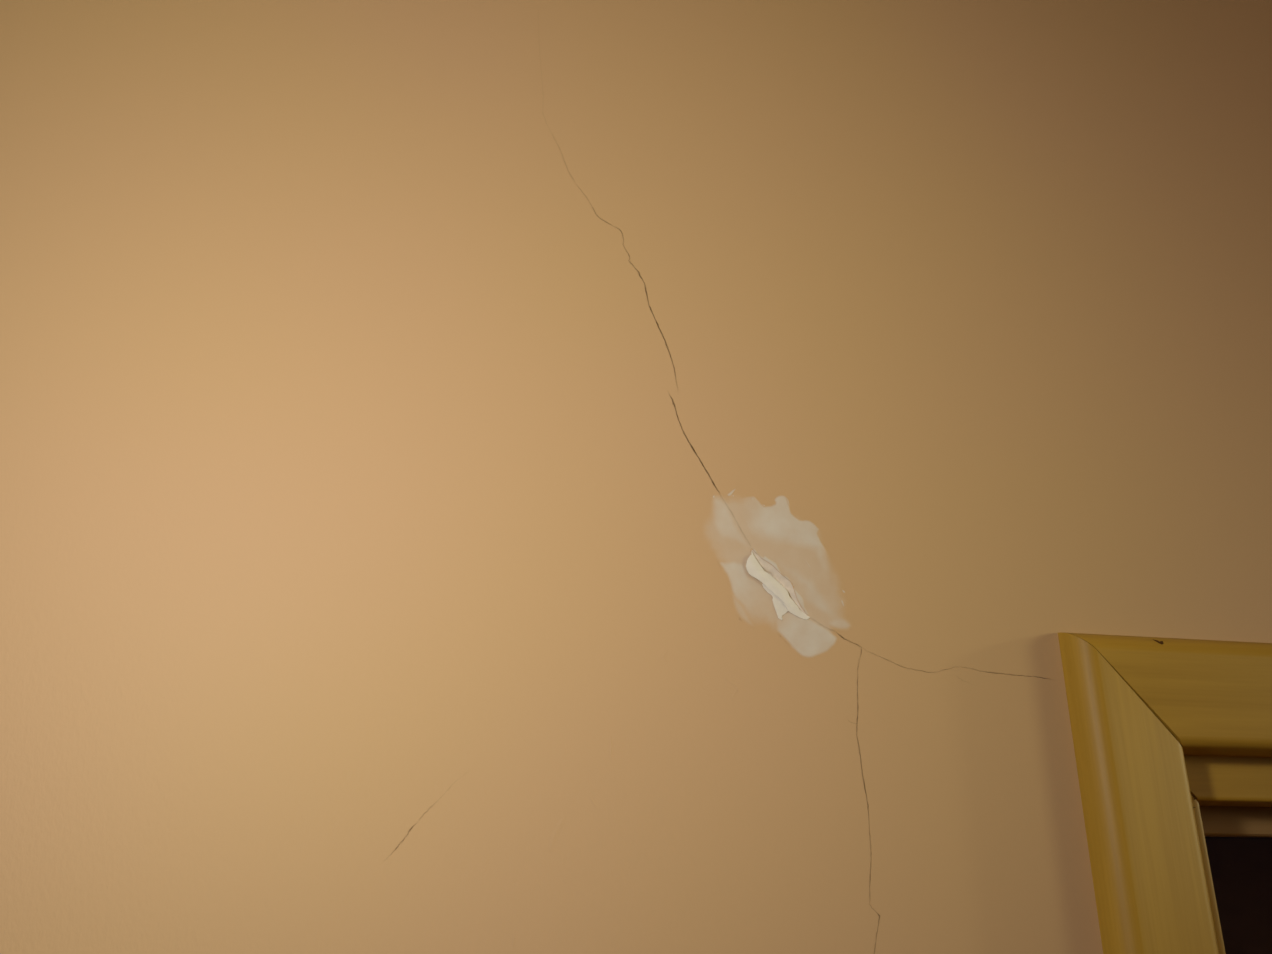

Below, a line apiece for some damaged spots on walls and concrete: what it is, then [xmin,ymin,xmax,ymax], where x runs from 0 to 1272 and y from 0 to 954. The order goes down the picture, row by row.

spalling [746,548,810,620]